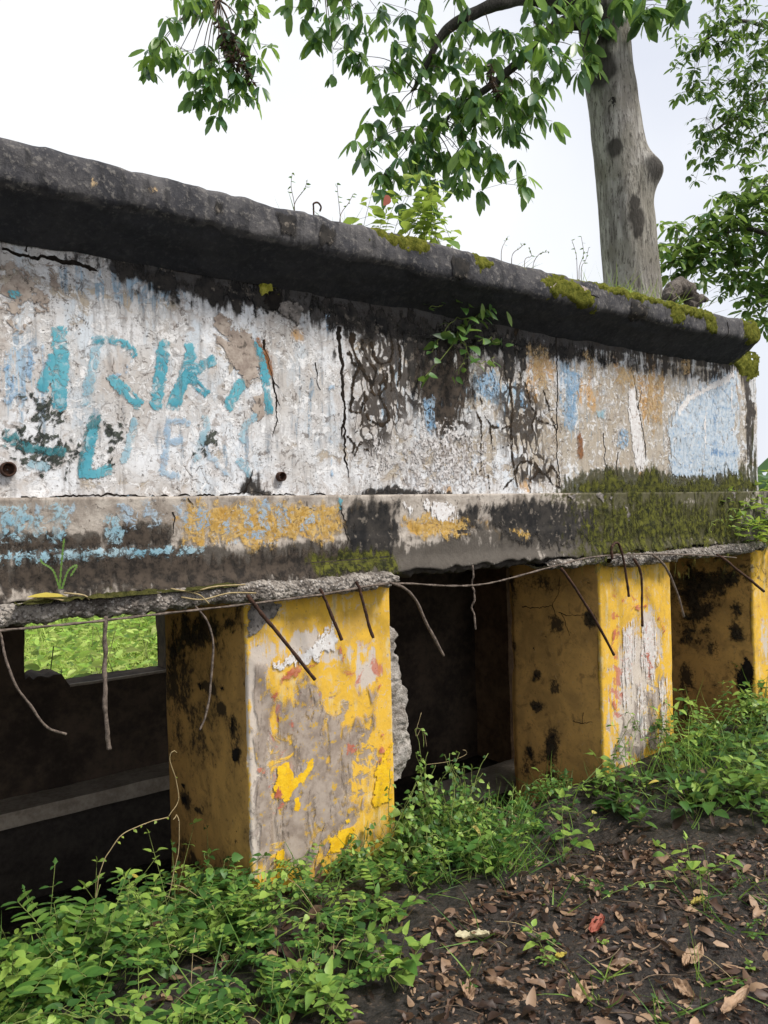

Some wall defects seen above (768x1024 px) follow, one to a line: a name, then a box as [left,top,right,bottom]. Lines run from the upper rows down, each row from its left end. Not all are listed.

crack [2,246,98,272]
peeling [213,312,265,421]
damp [114,260,616,441]
crack [21,326,403,547]
damp [167,602,242,675]
damp [0,484,596,605]
damp [674,558,755,651]
peeling [0,541,767,879]